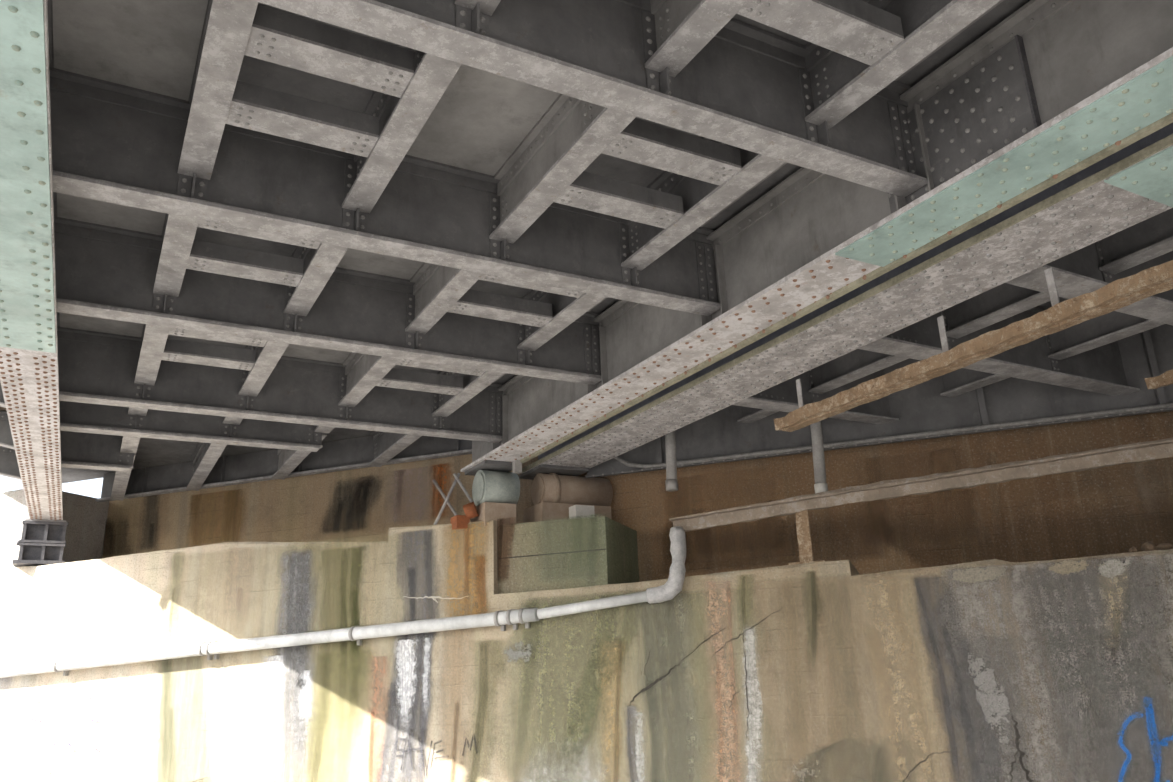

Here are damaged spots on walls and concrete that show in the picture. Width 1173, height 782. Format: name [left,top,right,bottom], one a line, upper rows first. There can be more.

damp [323,480,379,532]
crack [627,610,780,738]
spalling [967,653,1012,744]
damp [916,551,1173,782]
crack [902,751,946,782]
crack [1009,715,1033,782]